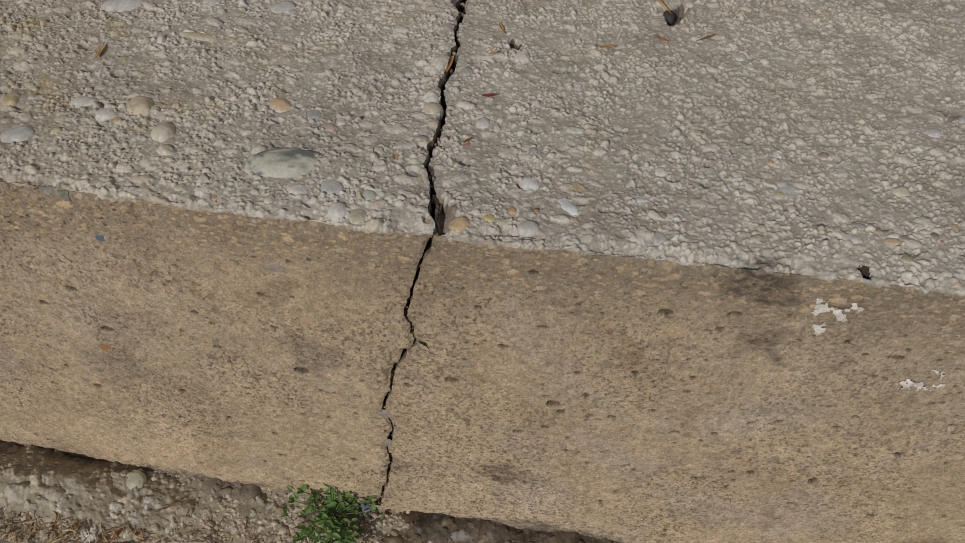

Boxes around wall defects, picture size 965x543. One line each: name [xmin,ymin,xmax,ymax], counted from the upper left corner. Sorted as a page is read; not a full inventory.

crack [374,0,467,503]
peeling [806,298,865,336]